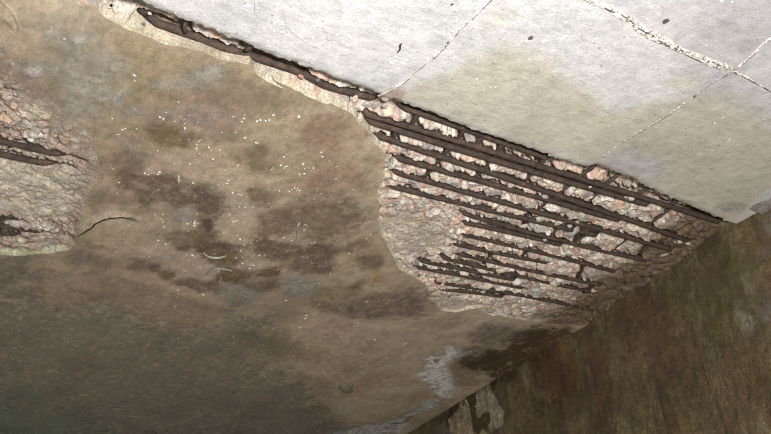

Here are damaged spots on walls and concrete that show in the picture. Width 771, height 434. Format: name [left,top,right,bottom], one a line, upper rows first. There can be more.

spalling [0,42,103,256]
crack [76,211,142,238]
water stain [0,146,527,434]
spalling [73,0,726,326]
peeling [448,383,505,434]